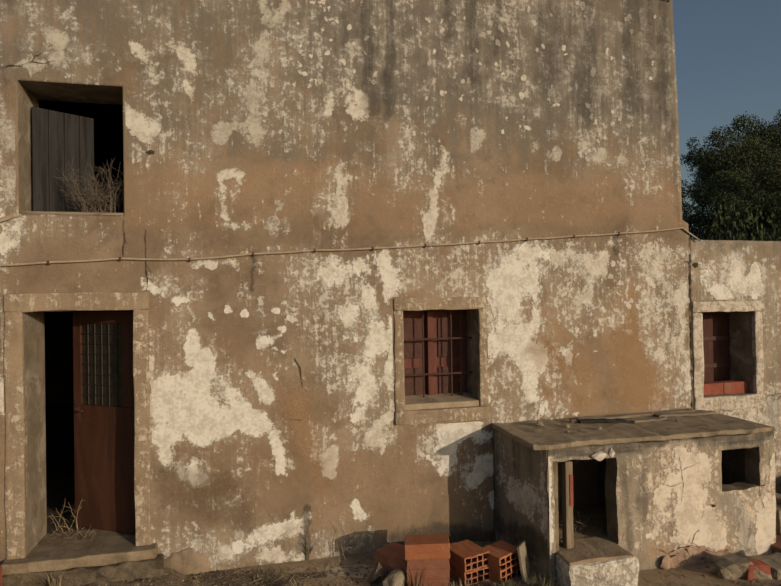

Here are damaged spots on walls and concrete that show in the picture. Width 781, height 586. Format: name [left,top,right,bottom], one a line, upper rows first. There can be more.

peeling [0,95,23,264]
peeling [151,328,289,488]
peeling [224,305,249,318]
peeling [255,308,297,354]
peeling [310,249,401,480]
peeling [485,240,692,420]
peeling [693,253,764,300]
peeling [185,511,312,565]
peeling [426,421,554,559]
peeling [646,446,733,570]
peeling [753,453,776,554]